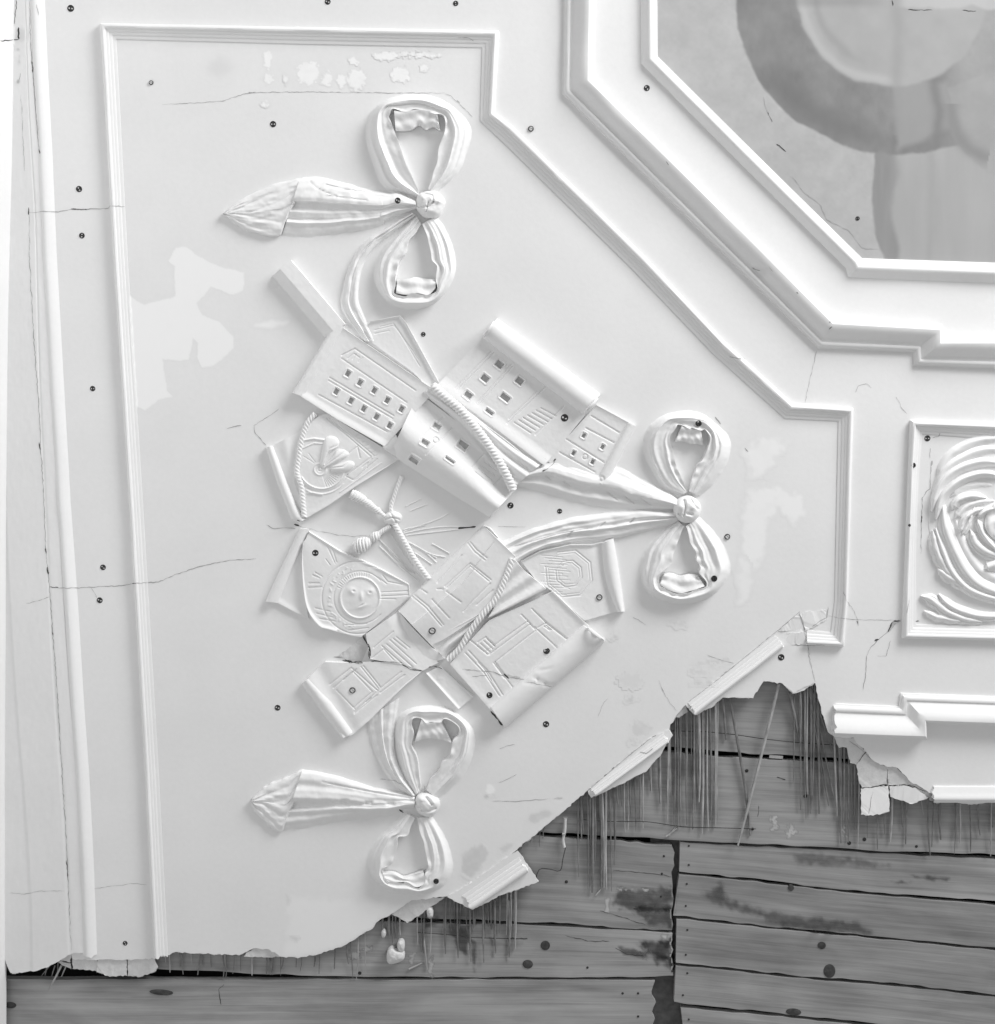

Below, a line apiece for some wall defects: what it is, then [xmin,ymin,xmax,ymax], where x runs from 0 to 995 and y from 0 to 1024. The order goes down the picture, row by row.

crack [2,1,40,169]
peeling [260,50,367,92]
peeling [372,49,442,84]
crack [15,206,251,948]
crack [660,592,917,710]
flaking render [779,610,826,645]
flaking render [834,737,938,816]
flaking render [58,954,158,977]
peeling [244,890,445,958]
leakage [642,938,673,966]